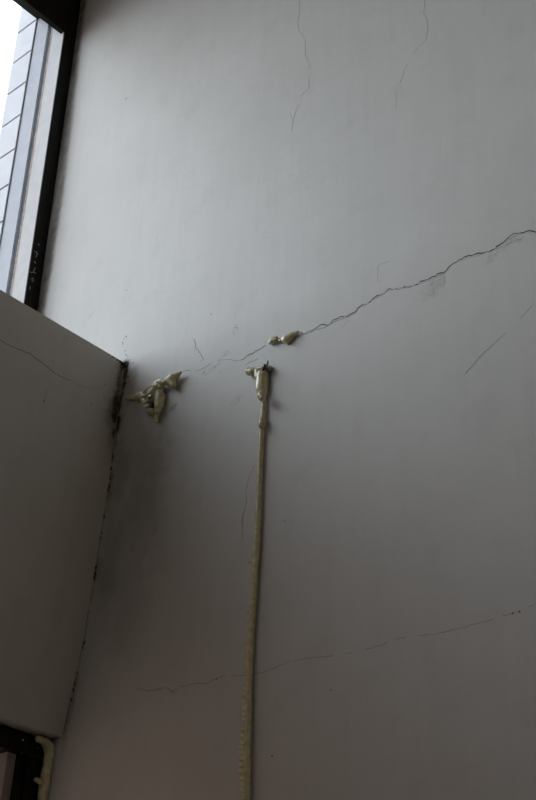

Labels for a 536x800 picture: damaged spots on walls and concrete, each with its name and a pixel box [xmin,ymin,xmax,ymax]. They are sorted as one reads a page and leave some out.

crack [300,230,536,334]
crack [185,340,267,373]